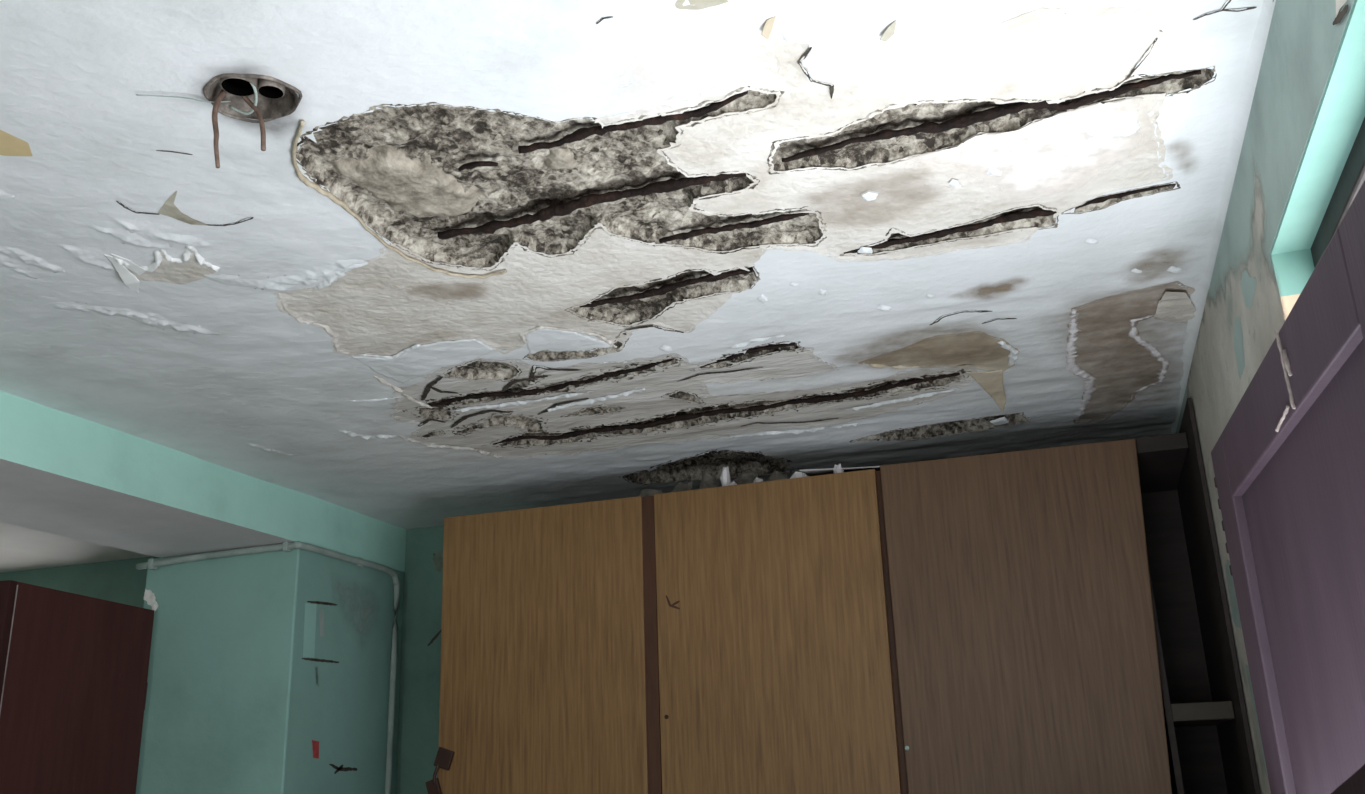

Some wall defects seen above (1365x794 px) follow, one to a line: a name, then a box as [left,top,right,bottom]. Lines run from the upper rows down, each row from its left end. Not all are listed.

peeling [675,0,743,10]
peeling [1333,0,1348,25]
peeling [0,130,32,156]
peeling [158,191,209,226]
peeling [274,6,1217,486]
peeling [104,245,221,293]